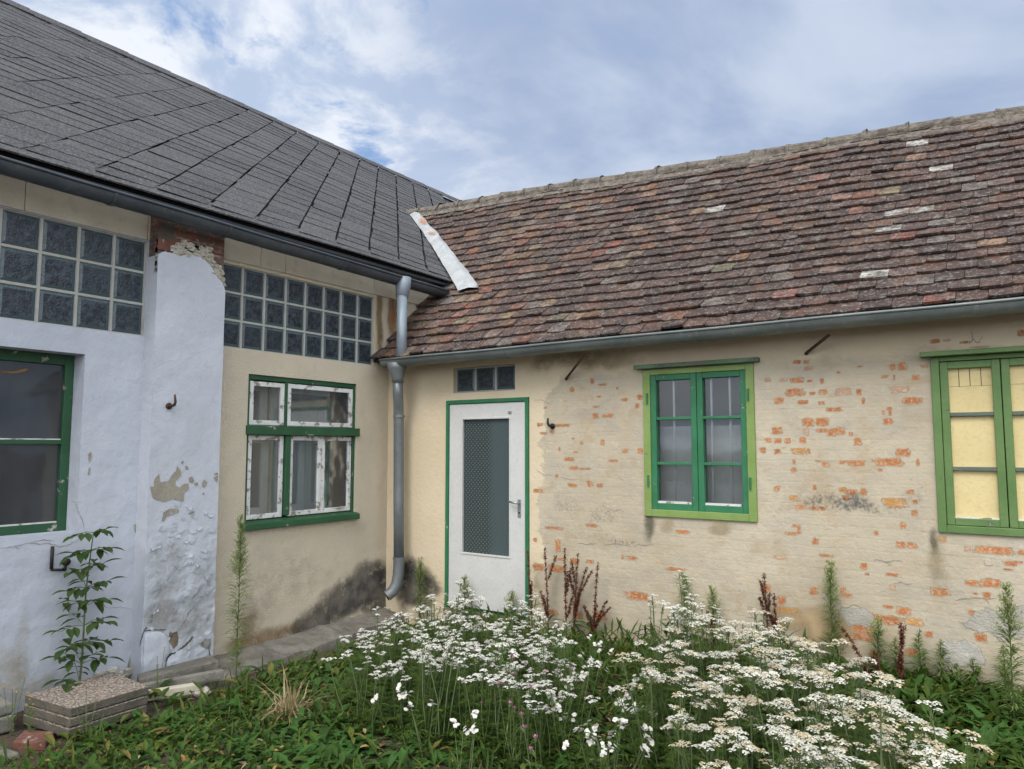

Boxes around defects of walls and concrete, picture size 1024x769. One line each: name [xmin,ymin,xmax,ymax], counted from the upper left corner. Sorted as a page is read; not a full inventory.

flaking render [154,230,226,287]
spalling [760,360,920,472]
spalling [881,362,928,425]
spalling [537,423,603,488]
peeling [150,461,218,521]
leakage [812,493,873,511]
spalling [881,490,918,529]
spalling [532,526,593,573]
spalling [964,546,1024,600]
flaking render [169,631,179,649]
leakage [231,559,439,650]
spalling [849,605,934,659]